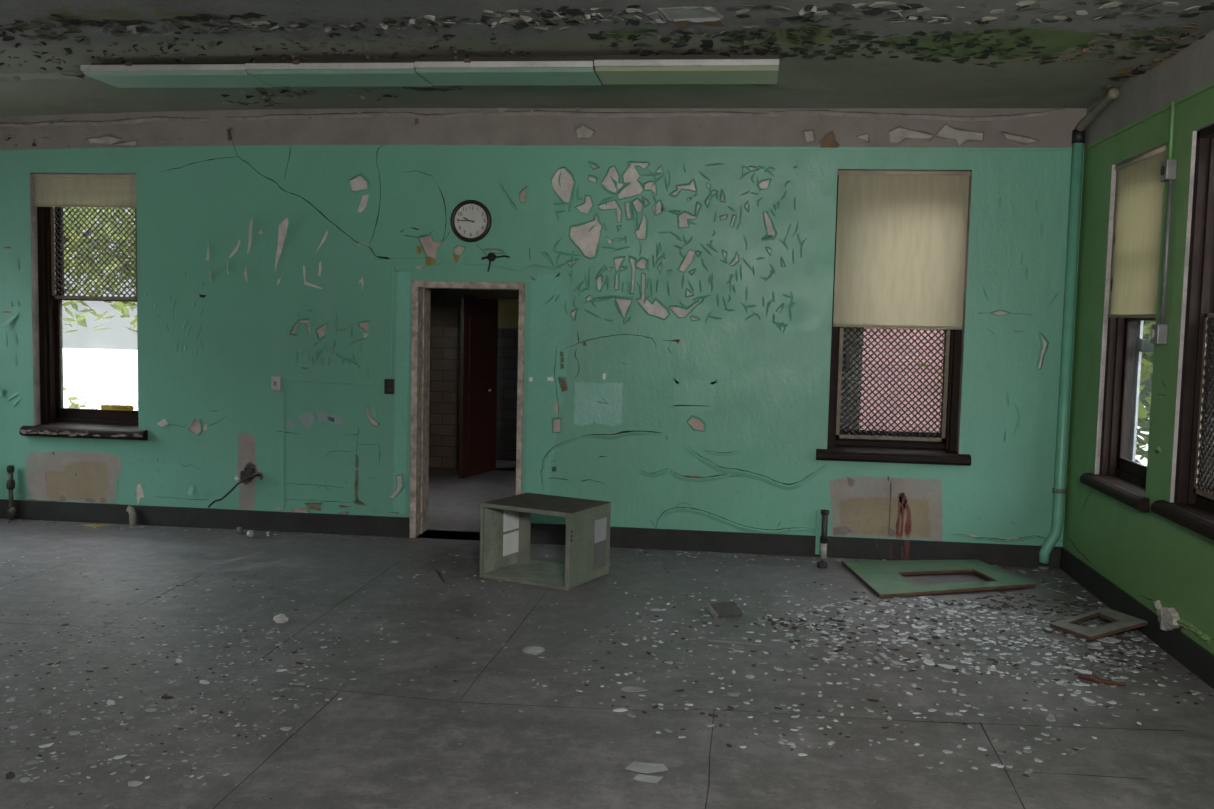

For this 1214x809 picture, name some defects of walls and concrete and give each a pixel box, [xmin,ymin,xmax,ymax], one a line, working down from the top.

peeling [0,0,1214,88]
flaking render [888,123,1040,147]
peeling [348,173,370,212]
crack [0,108,1074,261]
peeling [227,218,263,283]
peeling [275,218,288,285]
peeling [303,231,328,289]
peeling [540,161,807,333]
flaking render [20,430,143,504]
crack [540,431,828,534]